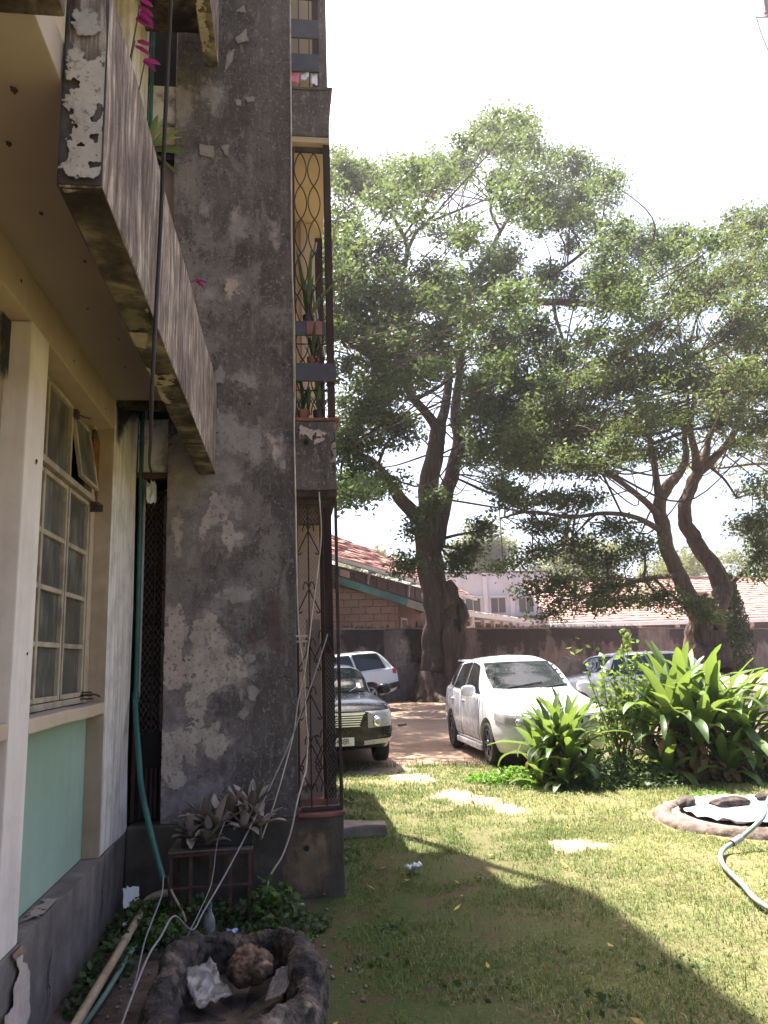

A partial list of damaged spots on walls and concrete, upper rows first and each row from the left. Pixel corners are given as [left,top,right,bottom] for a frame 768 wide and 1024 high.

peeling [58,7,106,179]
peeling [4,944,31,1024]